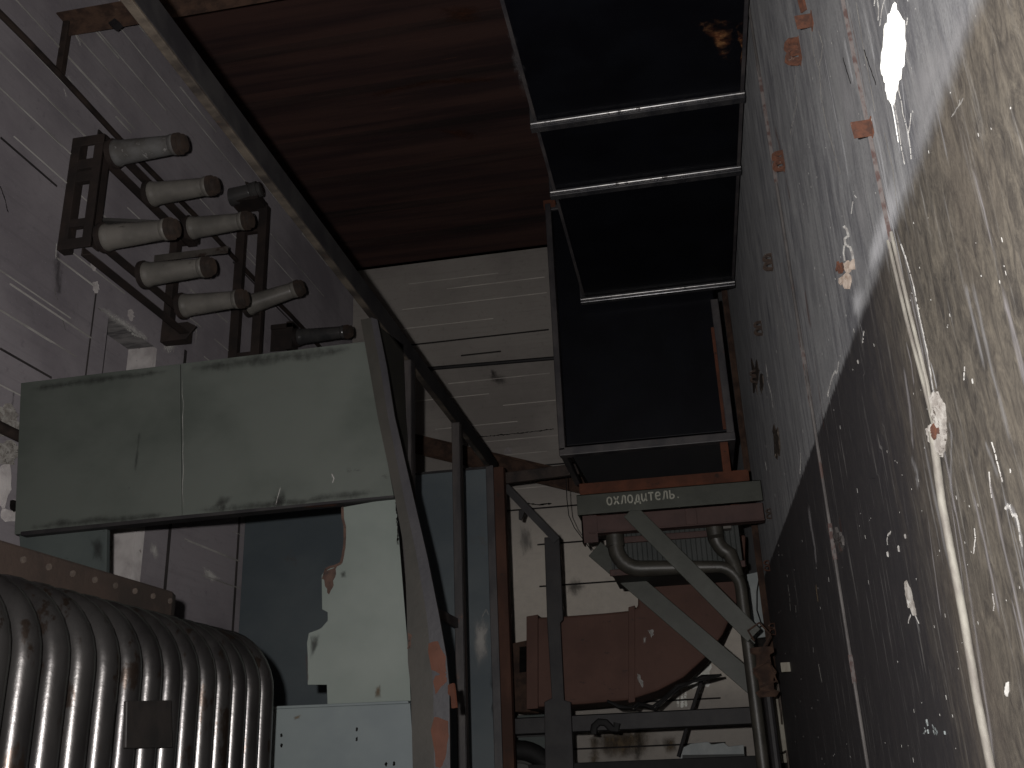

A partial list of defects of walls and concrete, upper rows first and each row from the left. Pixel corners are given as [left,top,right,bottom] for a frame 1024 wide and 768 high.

peeling [874,0,912,164]
peeling [835,225,855,289]
spalling [925,391,948,457]
peeling [904,580,919,624]